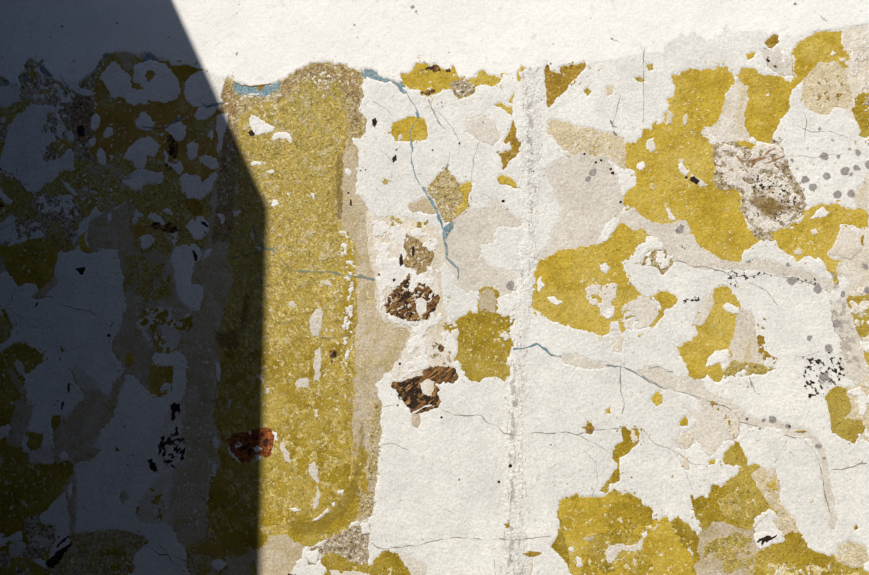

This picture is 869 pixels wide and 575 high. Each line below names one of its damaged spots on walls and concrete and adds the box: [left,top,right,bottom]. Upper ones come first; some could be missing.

peeling [0,41,525,575]
crack [386,93,480,279]
peeling [523,24,869,575]